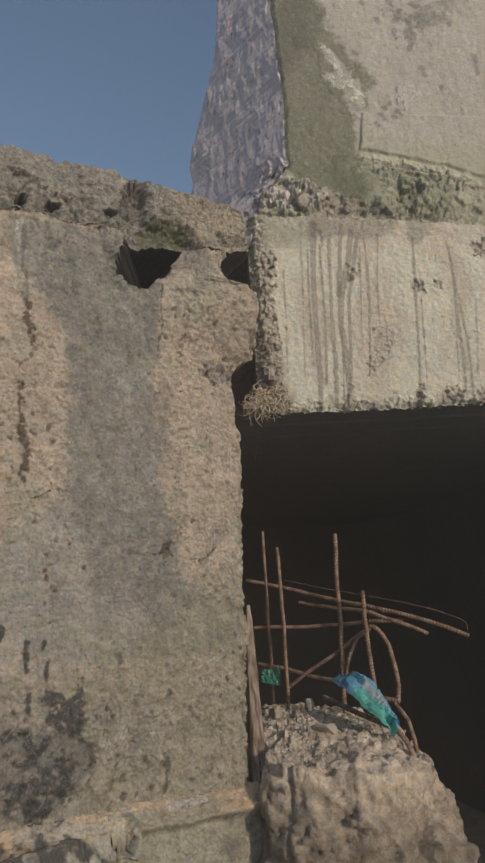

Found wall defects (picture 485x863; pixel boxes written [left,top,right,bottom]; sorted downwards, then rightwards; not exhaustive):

water stain [270,0,379,198]
water stain [15,219,37,345]
spalling [104,180,146,289]
water stain [300,217,394,409]
water stain [411,240,427,398]
water stain [447,247,474,394]
water stain [17,380,31,482]
water stain [22,640,30,674]
water stain [0,662,95,823]